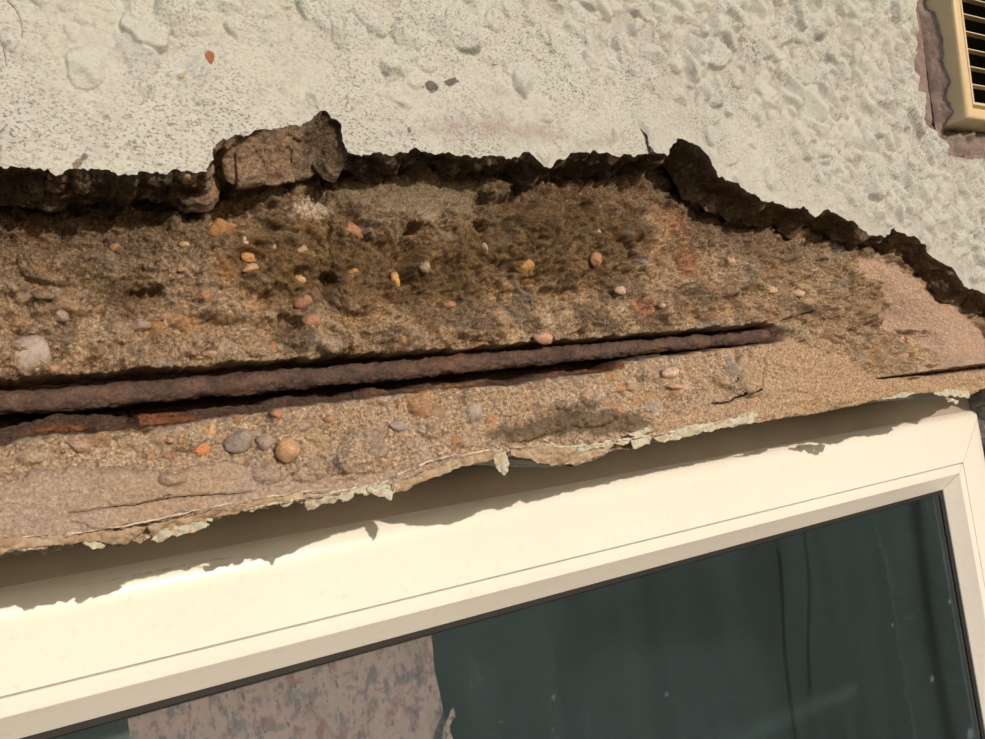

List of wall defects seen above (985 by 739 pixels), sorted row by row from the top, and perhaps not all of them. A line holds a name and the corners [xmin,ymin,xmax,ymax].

peeling [904,2,985,159]
spalling [0,110,985,557]
corrosion [122,412,193,430]
crack [76,491,251,513]